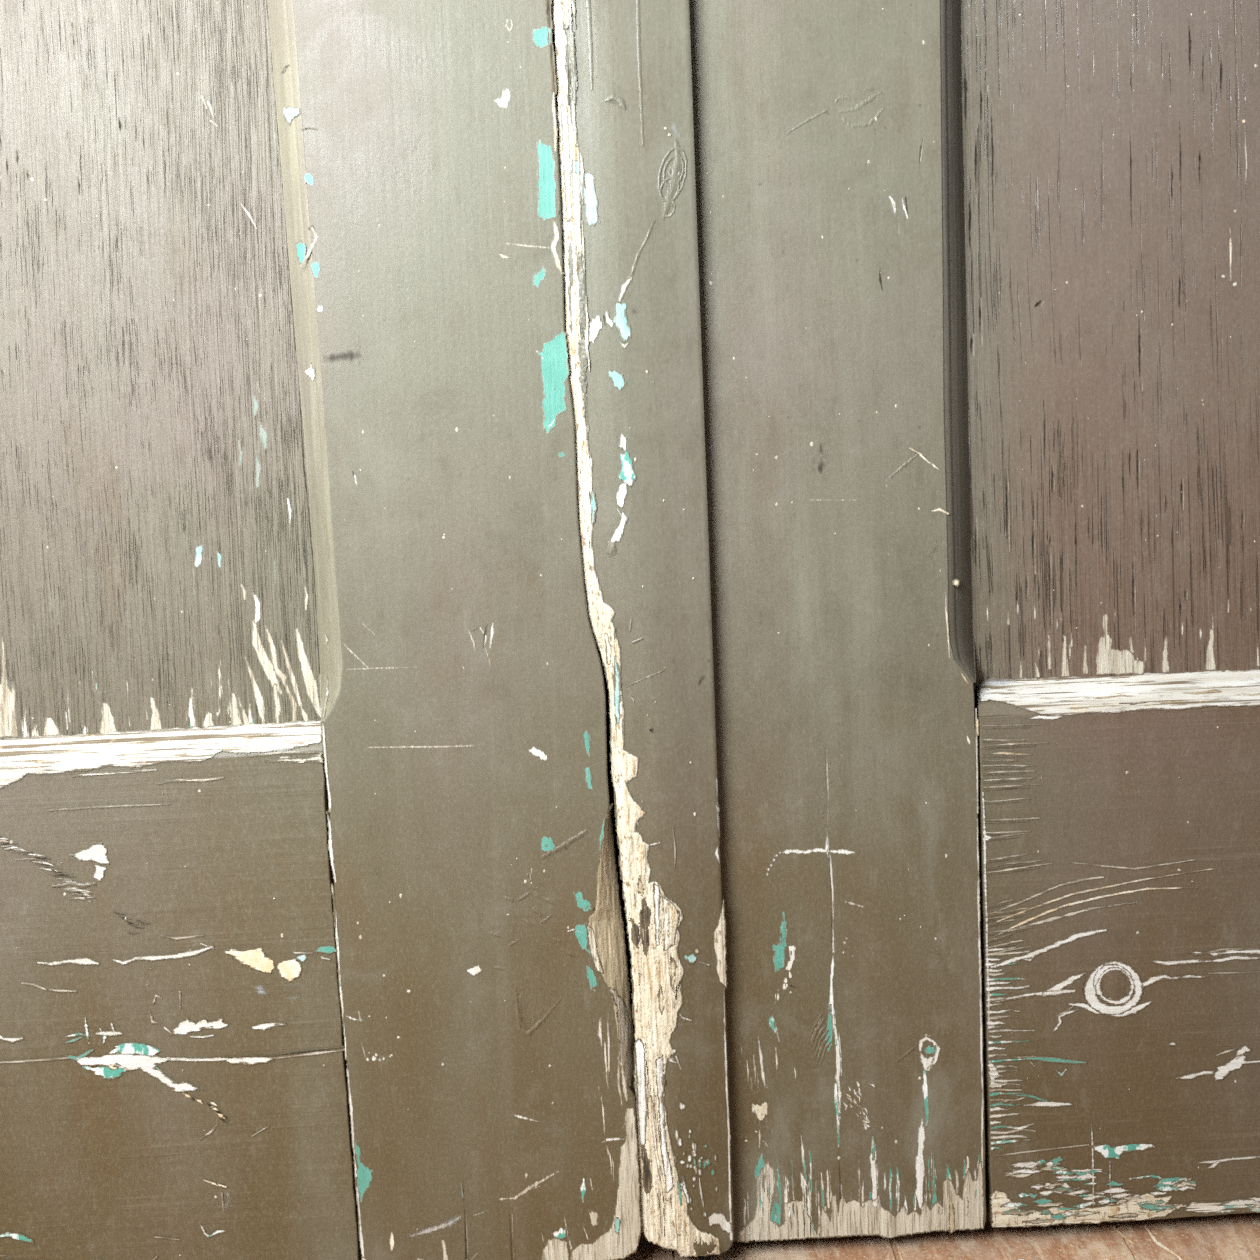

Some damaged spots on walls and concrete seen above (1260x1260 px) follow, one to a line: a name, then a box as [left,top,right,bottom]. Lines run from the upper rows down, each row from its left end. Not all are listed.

peeling [536,138,557,220]
crack [627,220,655,279]
peeling [536,331,570,434]
peeling [608,433,637,543]
peeling [978,669,1260,720]
peeling [0,720,324,789]
spalling [0,835,110,903]
peeling [111,942,338,981]
peeling [566,891,634,1103]
peeling [64,1016,230,1140]
peeling [1175,1045,1260,1081]
peeling [894,1034,941,1212]